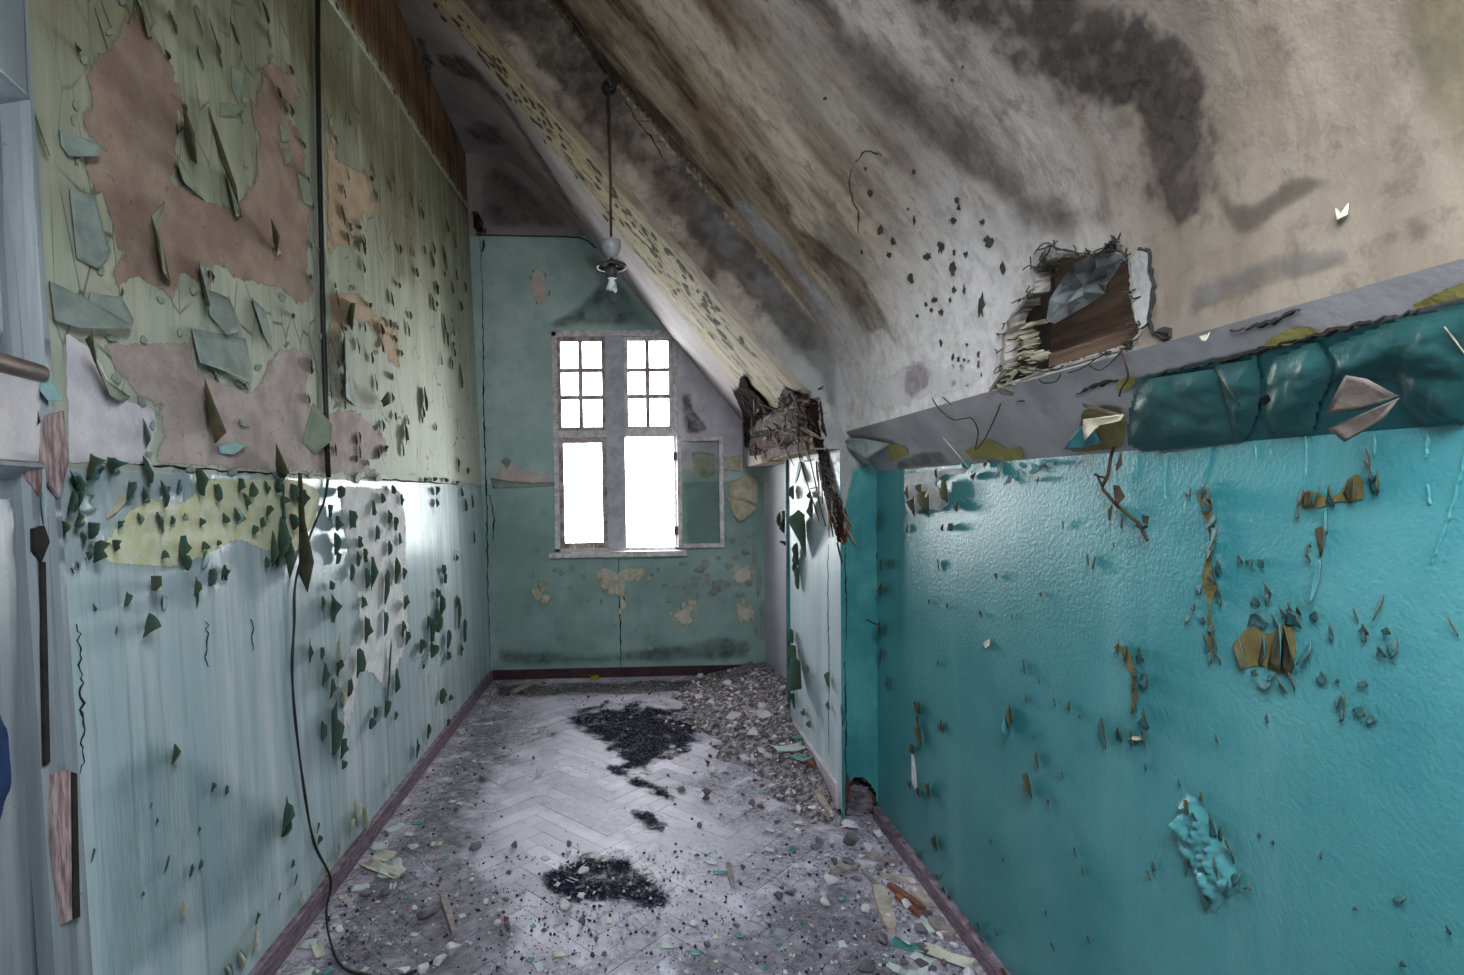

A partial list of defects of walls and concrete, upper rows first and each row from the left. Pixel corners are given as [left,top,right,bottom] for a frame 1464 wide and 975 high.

water stain [914,0,1216,226]
water stain [1228,180,1303,223]
flaking render [34,0,474,769]
spalling [528,376,857,651]
peeling [845,376,1135,533]
flaking render [939,241,1152,406]
peeling [1184,481,1334,694]
peeling [1294,448,1379,519]
peeling [0,716,12,819]
peeling [281,797,295,837]
peeling [785,629,830,740]
peeling [1097,640,1149,771]